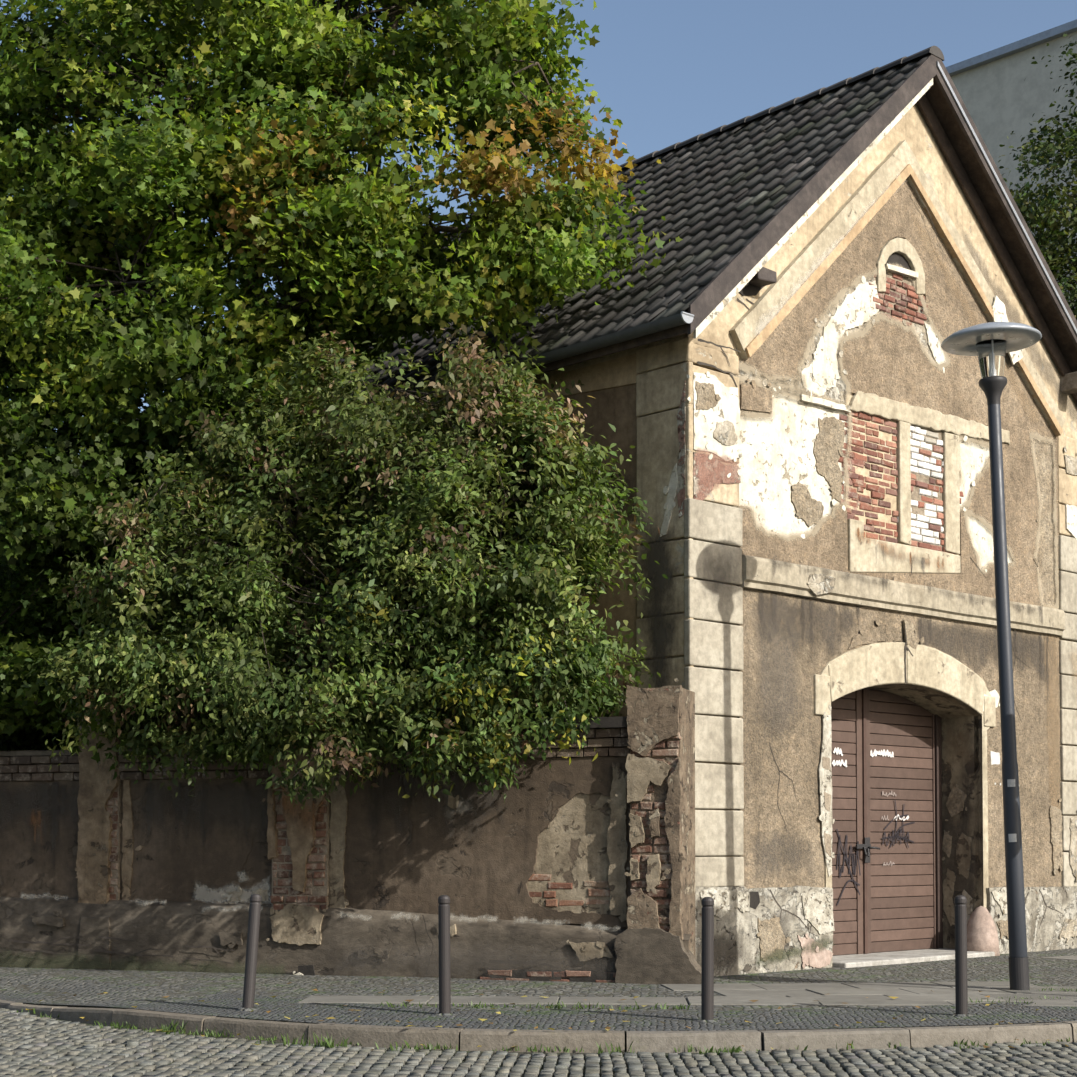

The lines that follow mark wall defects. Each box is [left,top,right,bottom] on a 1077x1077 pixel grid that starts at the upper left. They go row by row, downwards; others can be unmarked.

flaking render [687,264,950,541]
peeling [660,463,682,537]
flaking render [959,435,994,574]
flaking render [1007,546,1015,569]
flaking render [1030,432,1077,609]
peeling [119,780,143,901]
peeling [253,767,349,946]
flaking render [526,763,630,922]
peeling [942,784,972,926]